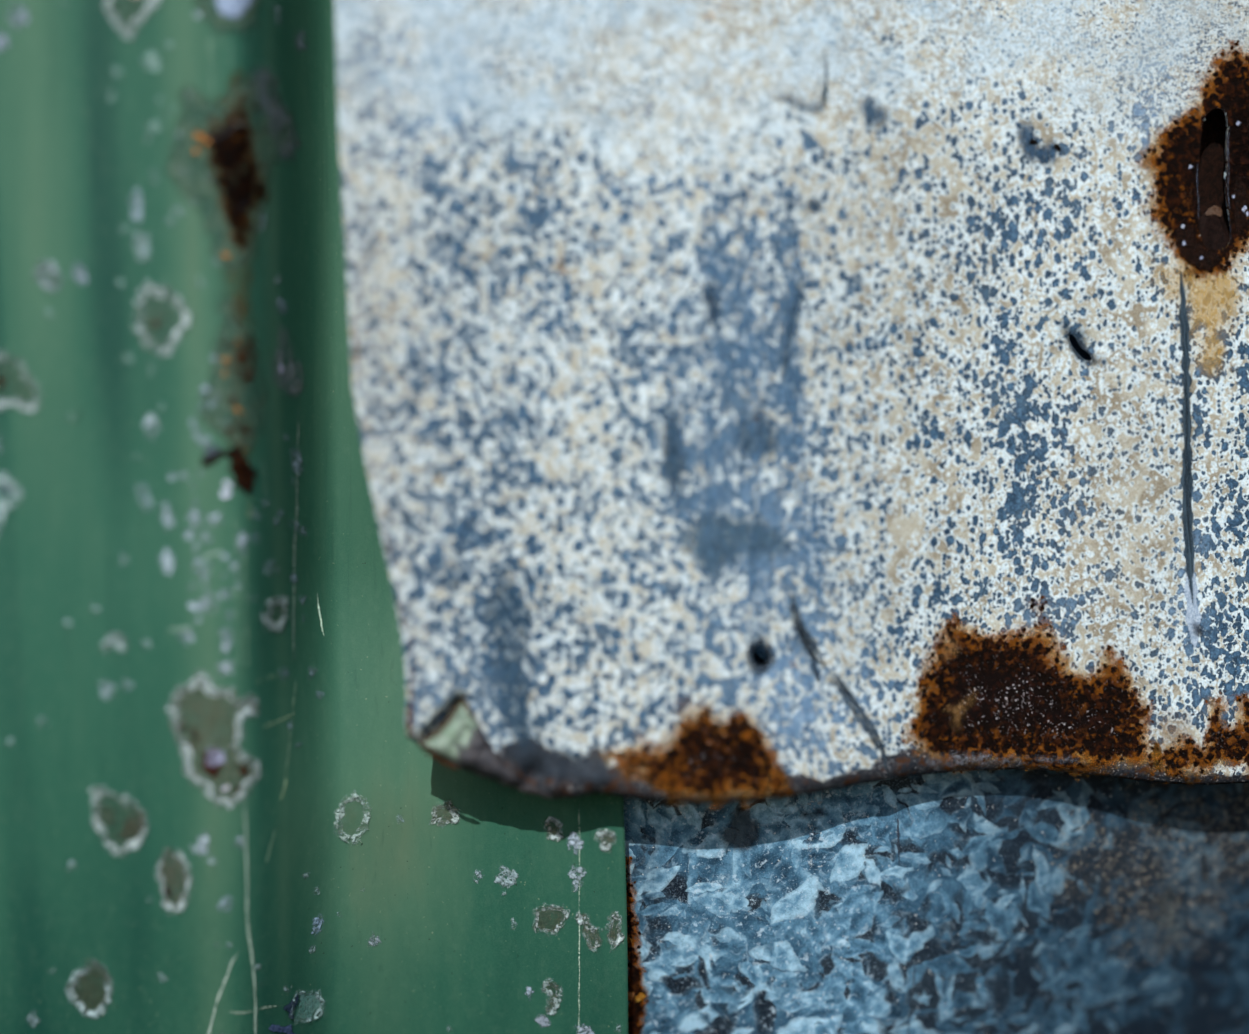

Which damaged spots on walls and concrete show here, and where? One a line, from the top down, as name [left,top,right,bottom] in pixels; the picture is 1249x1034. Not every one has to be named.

peeling [196,0,260,31]
rust [193,93,268,258]
rust [1138,40,1249,282]
rust [603,694,797,808]
rust [901,596,1249,781]
rust [625,856,649,1034]